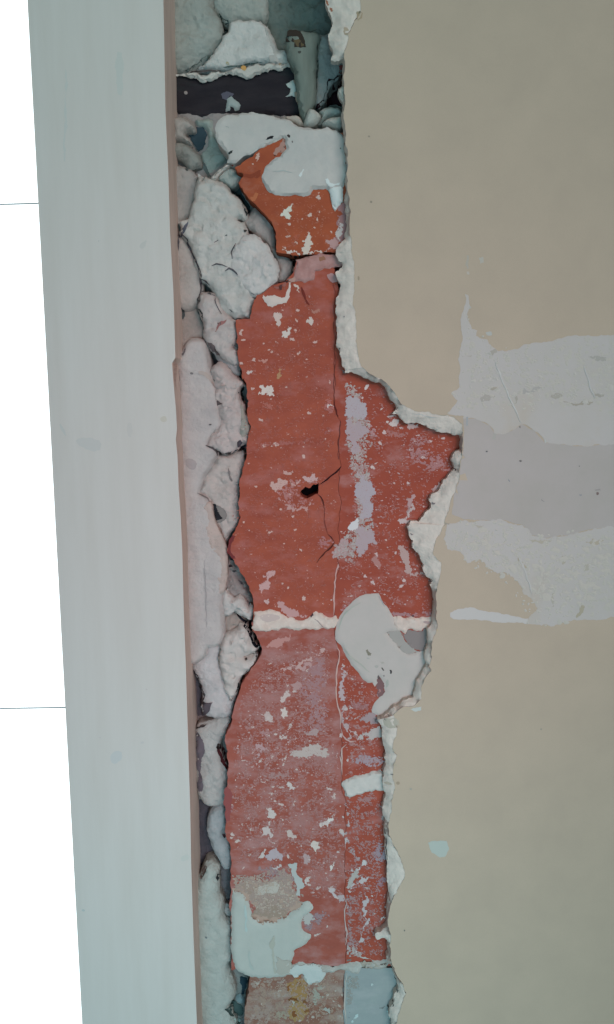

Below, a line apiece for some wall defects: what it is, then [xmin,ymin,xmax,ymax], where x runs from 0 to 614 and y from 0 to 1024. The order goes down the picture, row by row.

spalling [226,96,240,112]
spalling [286,80,296,97]
crack [317,354,341,562]
spalling [325,0,463,1024]